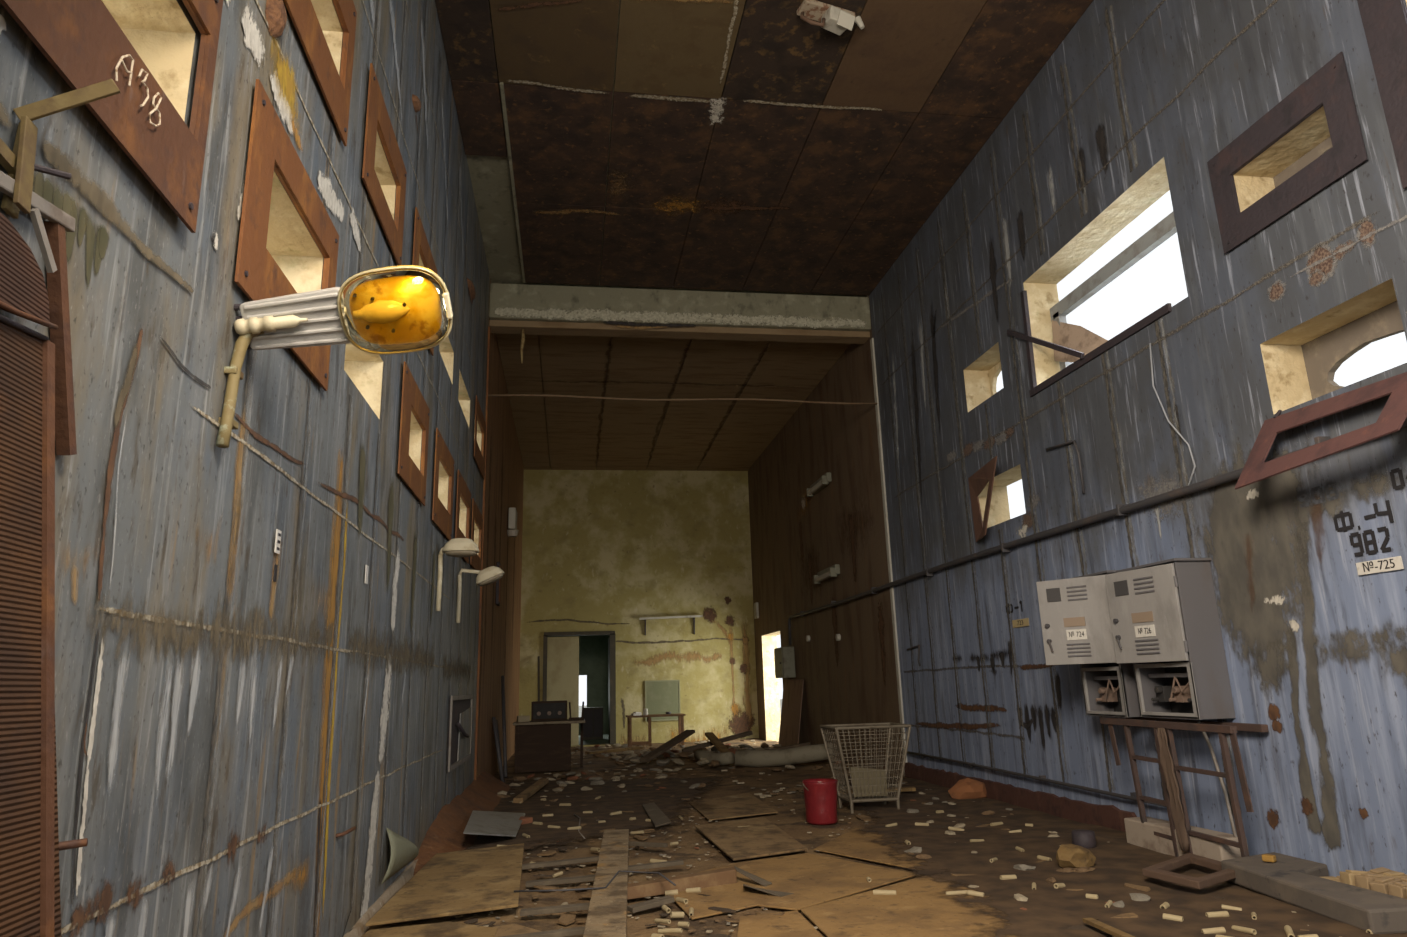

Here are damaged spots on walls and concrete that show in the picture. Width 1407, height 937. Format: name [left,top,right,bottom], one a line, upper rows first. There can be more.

damp [358,447,366,534]
damp [96,537,471,789]
rust [70,878,143,937]